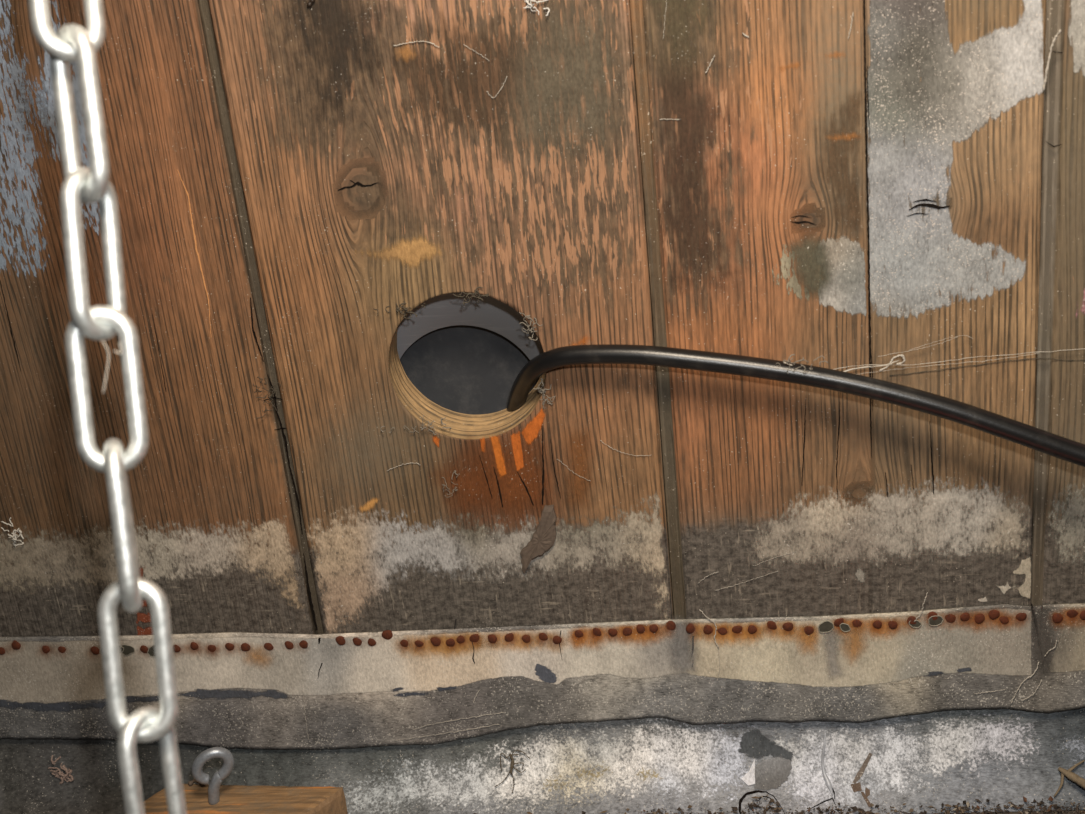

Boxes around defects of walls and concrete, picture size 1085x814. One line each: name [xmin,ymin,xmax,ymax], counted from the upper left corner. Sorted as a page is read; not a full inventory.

peeling [1068,0,1085,76]
peeling [0,0,61,278]
peeling [69,61,90,168]
peeling [772,0,1044,318]
crack [250,297,323,677]
leakage [134,519,302,608]
leakage [172,409,1032,695]
leakage [0,640,106,704]
leakage [119,640,159,697]
rust [400,625,674,654]
rust [689,622,815,648]
rust [834,619,911,656]